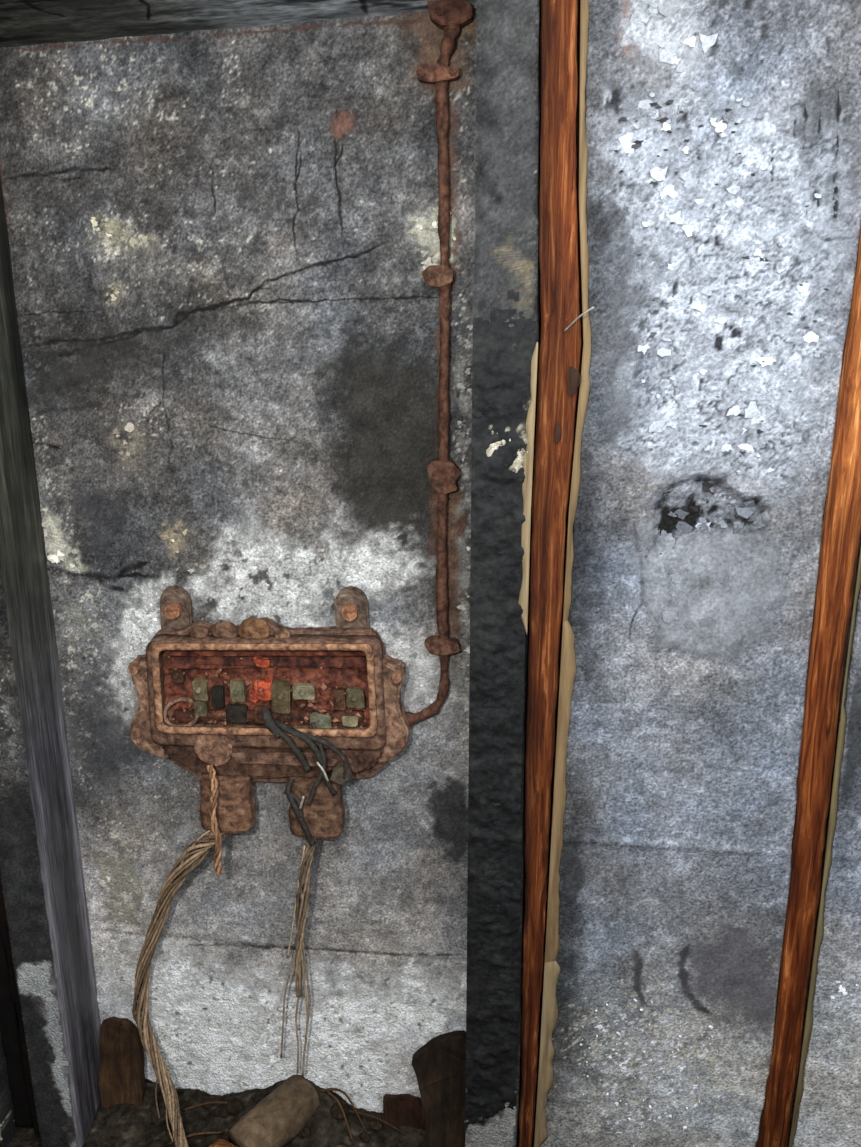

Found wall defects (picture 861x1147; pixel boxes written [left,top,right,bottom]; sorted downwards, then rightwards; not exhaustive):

crack [9,167,110,179]
crack [28,115,438,356]
spalling [603,0,847,555]
damp [73,344,440,768]